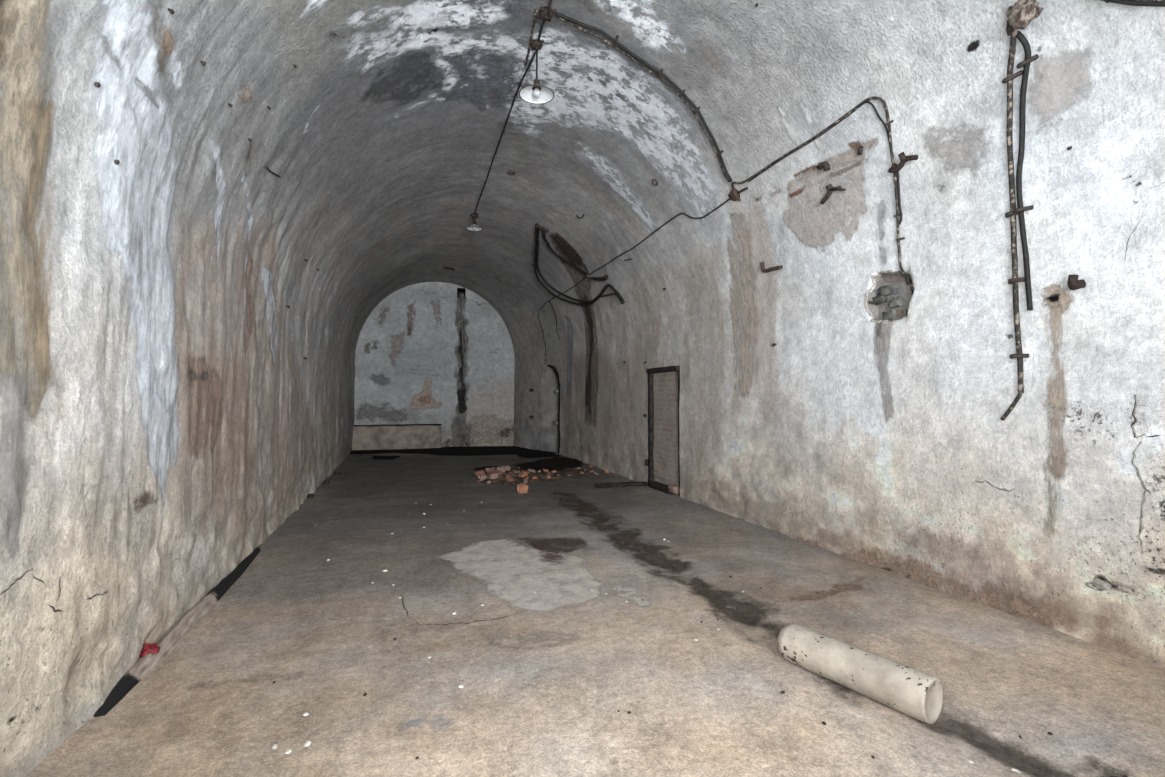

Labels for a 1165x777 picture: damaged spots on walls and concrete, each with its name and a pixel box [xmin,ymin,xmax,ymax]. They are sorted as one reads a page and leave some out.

water stain [348,0,719,233]
flaking render [755,138,877,251]
water stain [0,0,52,556]
spalling [865,270,915,323]
flaking render [410,378,442,410]
water stain [1042,401,1114,444]
crack [1131,395,1161,554]
water stain [1137,467,1165,583]